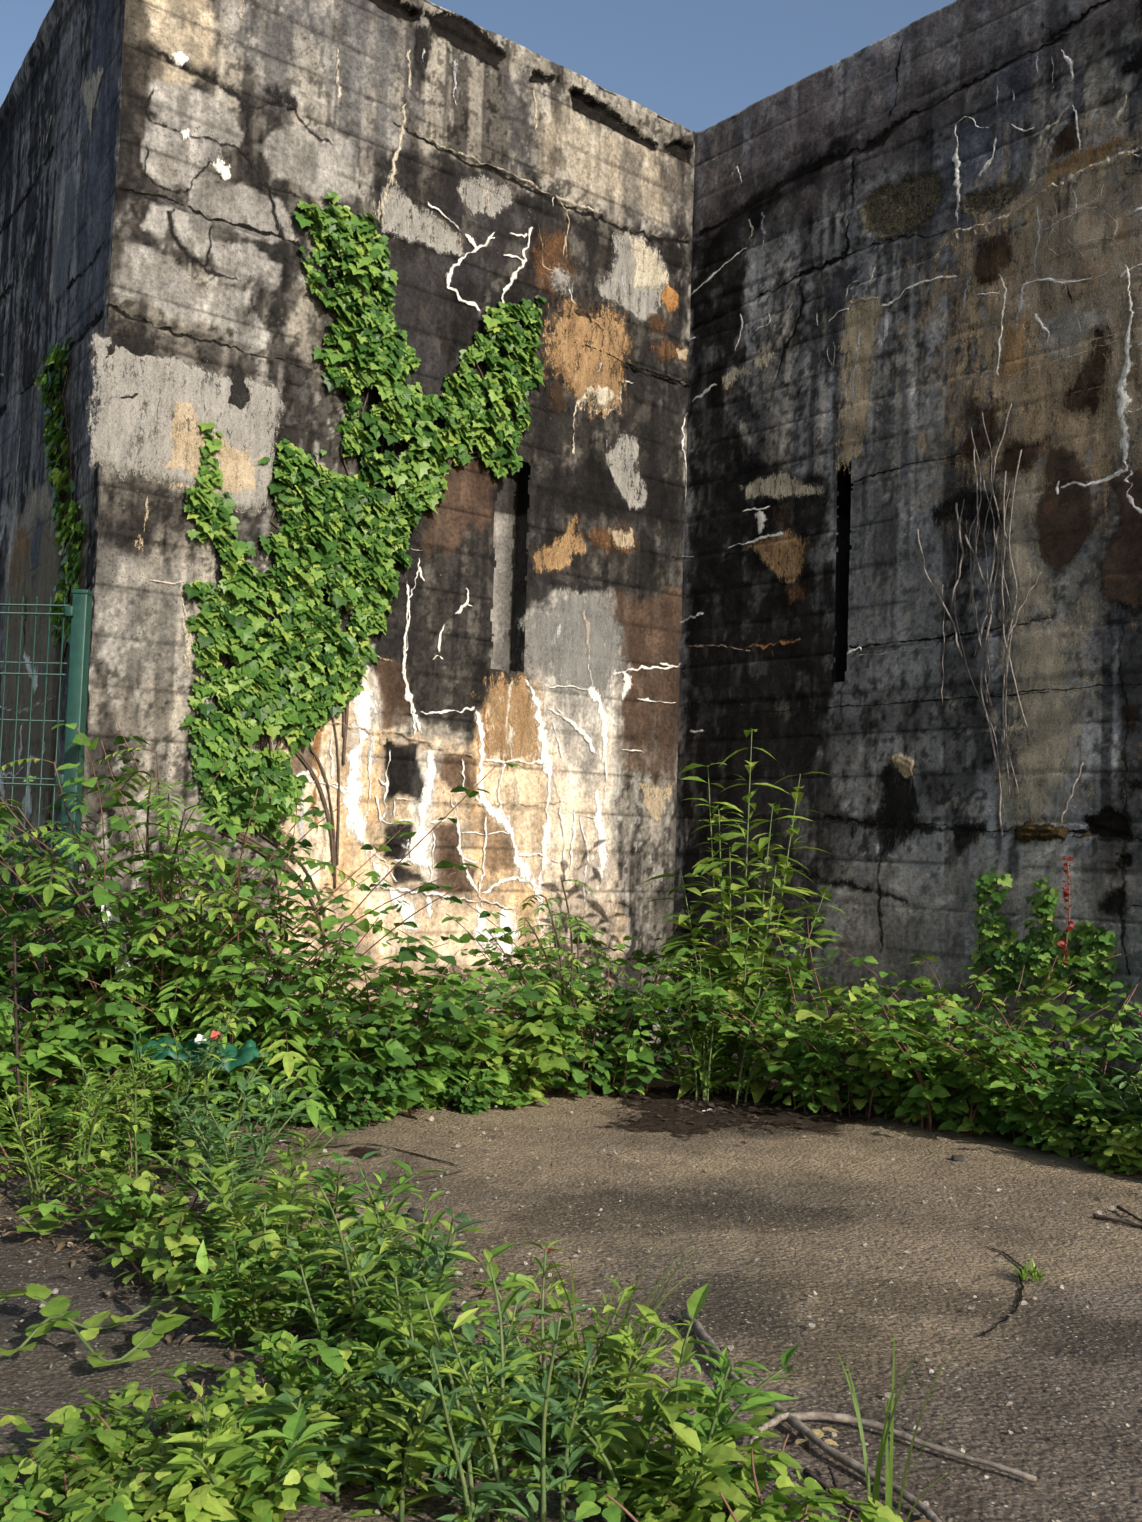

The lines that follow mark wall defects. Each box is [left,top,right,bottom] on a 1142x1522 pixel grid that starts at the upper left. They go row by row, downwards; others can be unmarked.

leakage [1036,49,1074,83]
crack [394,0,1110,383]
spalling [857,170,1023,241]
spalling [1045,120,1129,187]
peeling [86,326,285,515]
crack [574,342,717,499]
spalling [728,471,824,604]
leakage [816,96,1142,832]
leakage [308,577,626,962]